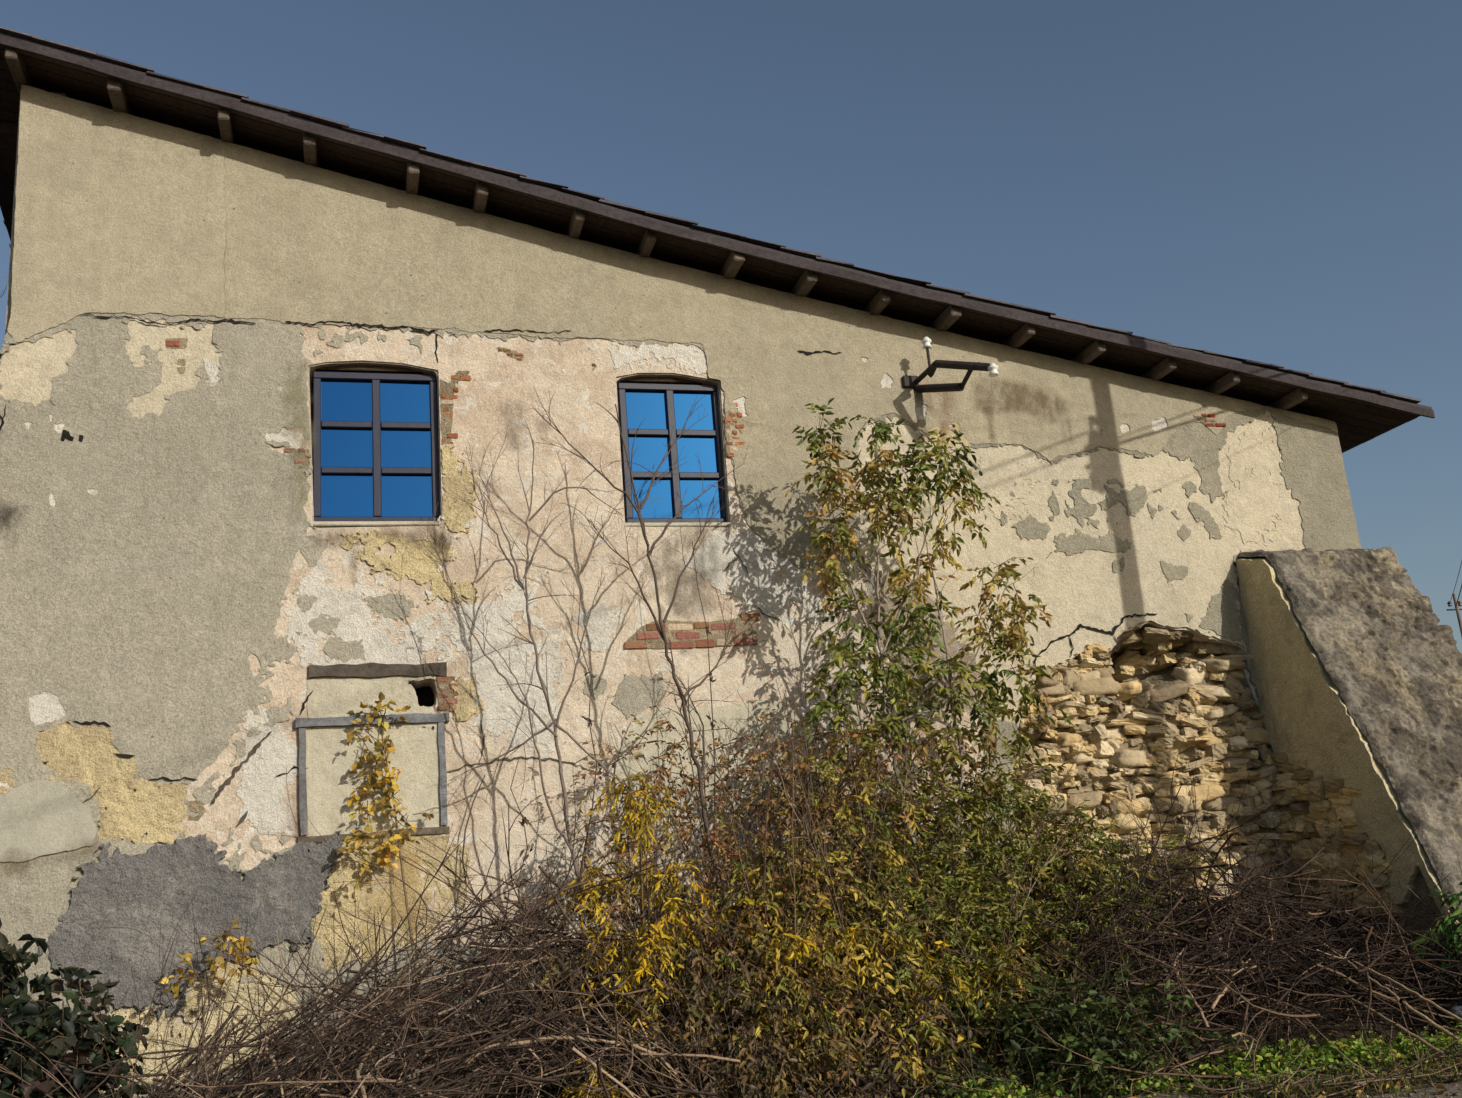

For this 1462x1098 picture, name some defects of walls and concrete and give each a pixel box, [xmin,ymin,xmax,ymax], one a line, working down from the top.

peeling [0,330,78,433]
crack [79,313,440,362]
crack [485,327,571,335]
peeling [28,315,1305,971]
crack [1030,613,1157,679]
crack [73,691,313,828]